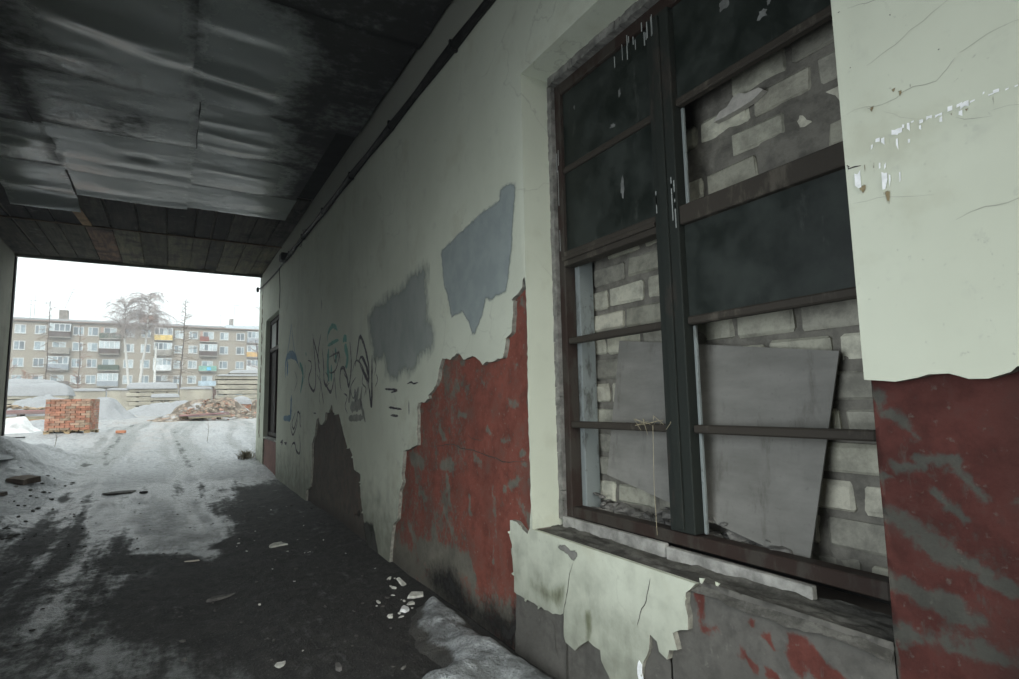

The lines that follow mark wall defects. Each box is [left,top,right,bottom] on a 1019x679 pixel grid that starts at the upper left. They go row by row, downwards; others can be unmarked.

spalling [879,163,901,190]
crack [846,20,1016,119]
spalling [871,84,1018,149]
flaking render [308,410,366,541]
flaking render [393,289,610,679]
flaking render [637,371,1019,679]